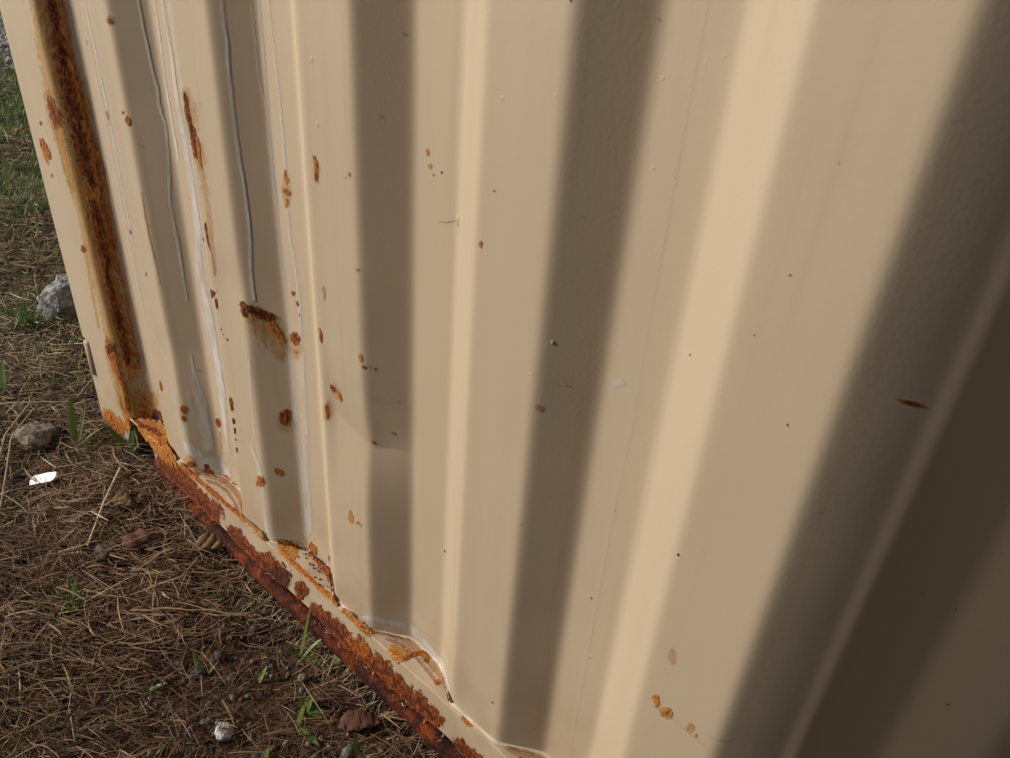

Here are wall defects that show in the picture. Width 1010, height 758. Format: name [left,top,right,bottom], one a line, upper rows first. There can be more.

damp [136,0,229,452]
damp [183,354,230,478]
corrosion [29,0,445,729]
damp [220,0,255,302]
damp [265,223,312,543]
corrosion [449,737,483,758]
corrosion [651,695,672,719]